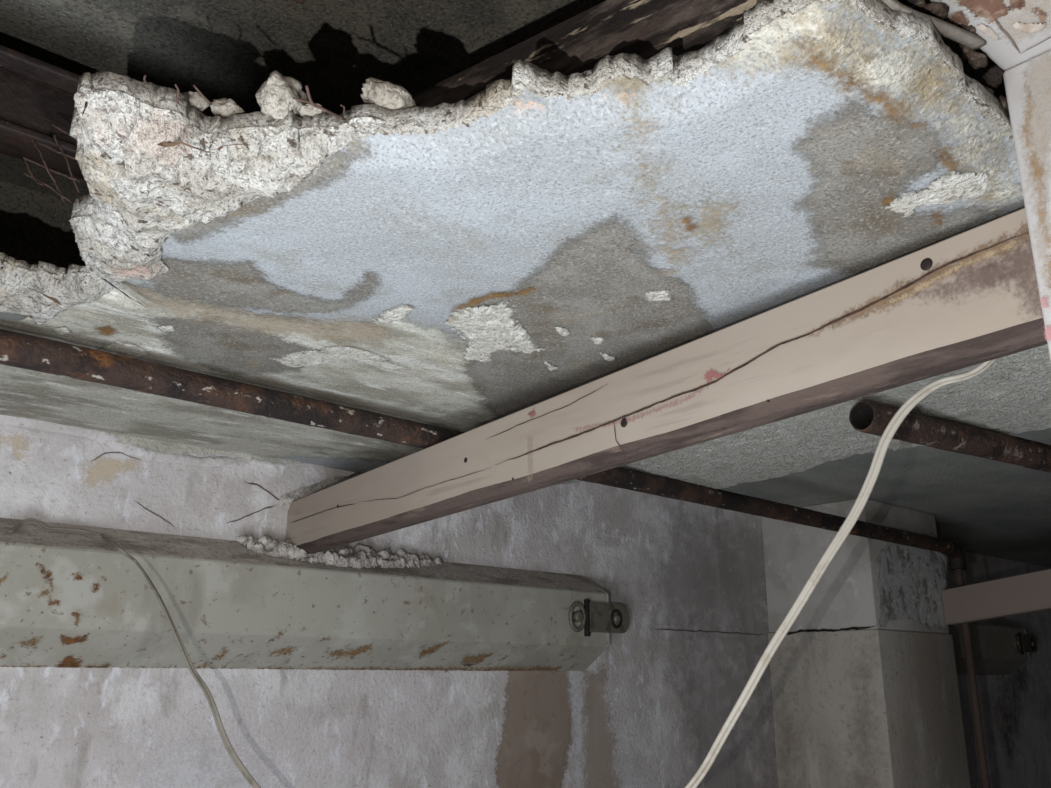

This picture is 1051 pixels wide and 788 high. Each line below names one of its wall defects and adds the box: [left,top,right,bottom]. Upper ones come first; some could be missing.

peeling [948,0,1047,41]
spalling [0,90,386,336]
damp [719,0,1051,335]
peeling [885,171,996,217]
peeling [644,290,671,301]
damp [0,216,712,432]
crack [228,232,1029,523]
damp [0,364,423,466]
corrosion [36,563,60,606]
corrosion [0,612,123,668]
corrosion [256,630,577,671]
crack [655,626,874,635]